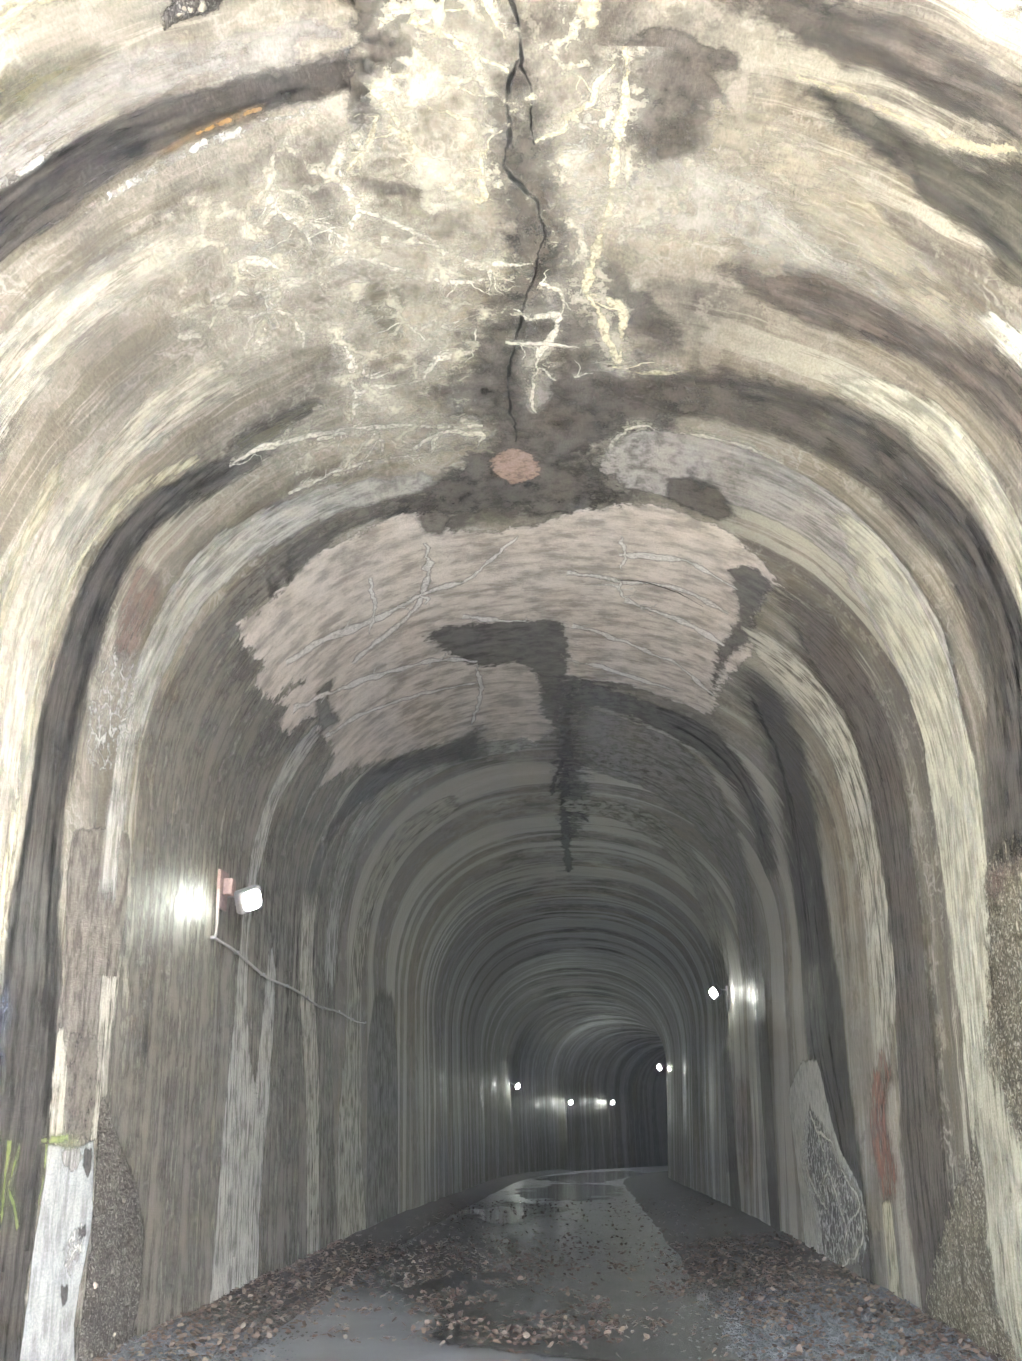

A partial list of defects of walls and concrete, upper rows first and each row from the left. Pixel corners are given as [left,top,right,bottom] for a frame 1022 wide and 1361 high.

spalling [162,0,222,31]
water stain [461,0,483,20]
water stain [539,0,601,75]
water stain [319,268,446,387]
crack [209,0,681,495]
water stain [287,429,380,477]
peeling [236,502,785,787]
peeling [20,827,144,1361]
peeling [789,1059,869,1278]
spalling [925,834,1022,1361]